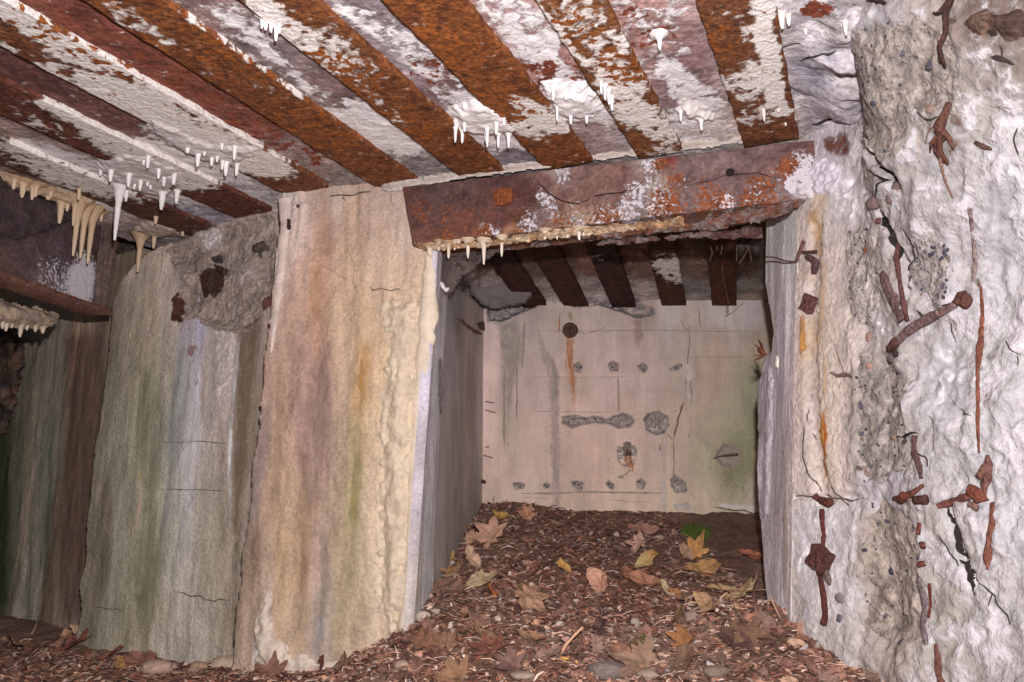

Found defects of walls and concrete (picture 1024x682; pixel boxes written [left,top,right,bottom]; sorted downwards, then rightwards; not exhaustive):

water stain [448,97,514,148]
water stain [536,75,615,125]
water stain [0,154,185,272]
water stain [382,161,552,192]
rust [533,176,646,205]
rust [879,207,996,570]
spalling [561,410,670,451]
crack [169,488,222,496]
spalling [606,446,637,490]
rust [805,493,836,626]
crack [937,507,1011,625]
crack [175,591,229,606]